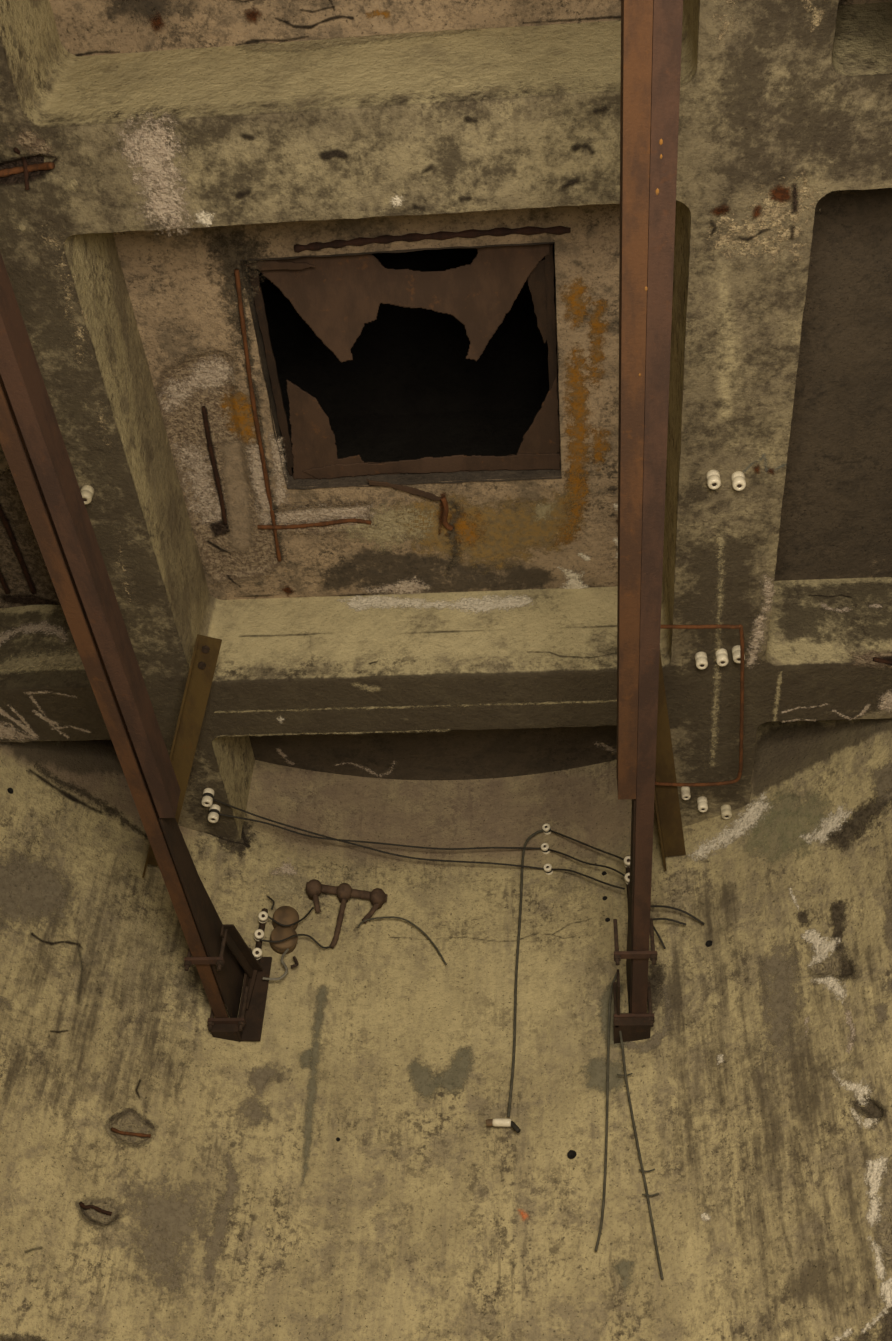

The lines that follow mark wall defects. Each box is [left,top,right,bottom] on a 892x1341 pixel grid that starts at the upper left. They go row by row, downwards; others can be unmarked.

crack [75,49,115,57]
crack [236,0,354,46]
crack [526,15,621,23]
leakage [119,116,265,348]
corrosion [553,277,611,546]
spalling [0,457,61,609]
spalling [105,1108,158,1148]
leakage [300,985,328,1182]
leakage [759,929,877,1128]
spalling [76,1198,124,1229]
leakage [823,1156,892,1341]
spalling [0,1333,42,1341]